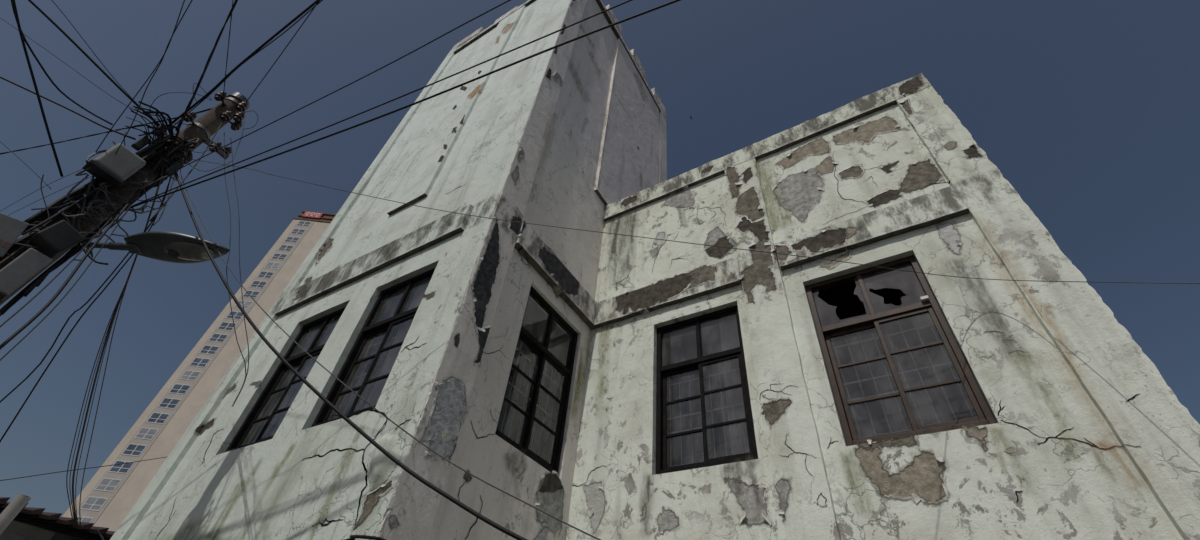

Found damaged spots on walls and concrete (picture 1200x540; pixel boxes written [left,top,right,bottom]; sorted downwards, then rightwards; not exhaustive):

peeling [614,77,922,314]
peeling [866,159,944,207]
spalling [944,141,982,158]
peeling [935,222,963,254]
spalling [469,216,526,369]
peeling [420,376,467,462]
crack [998,401,1141,450]
crack [303,408,411,530]
crack [449,411,495,540]
peeling [534,471,565,540]
peeling [855,434,950,506]